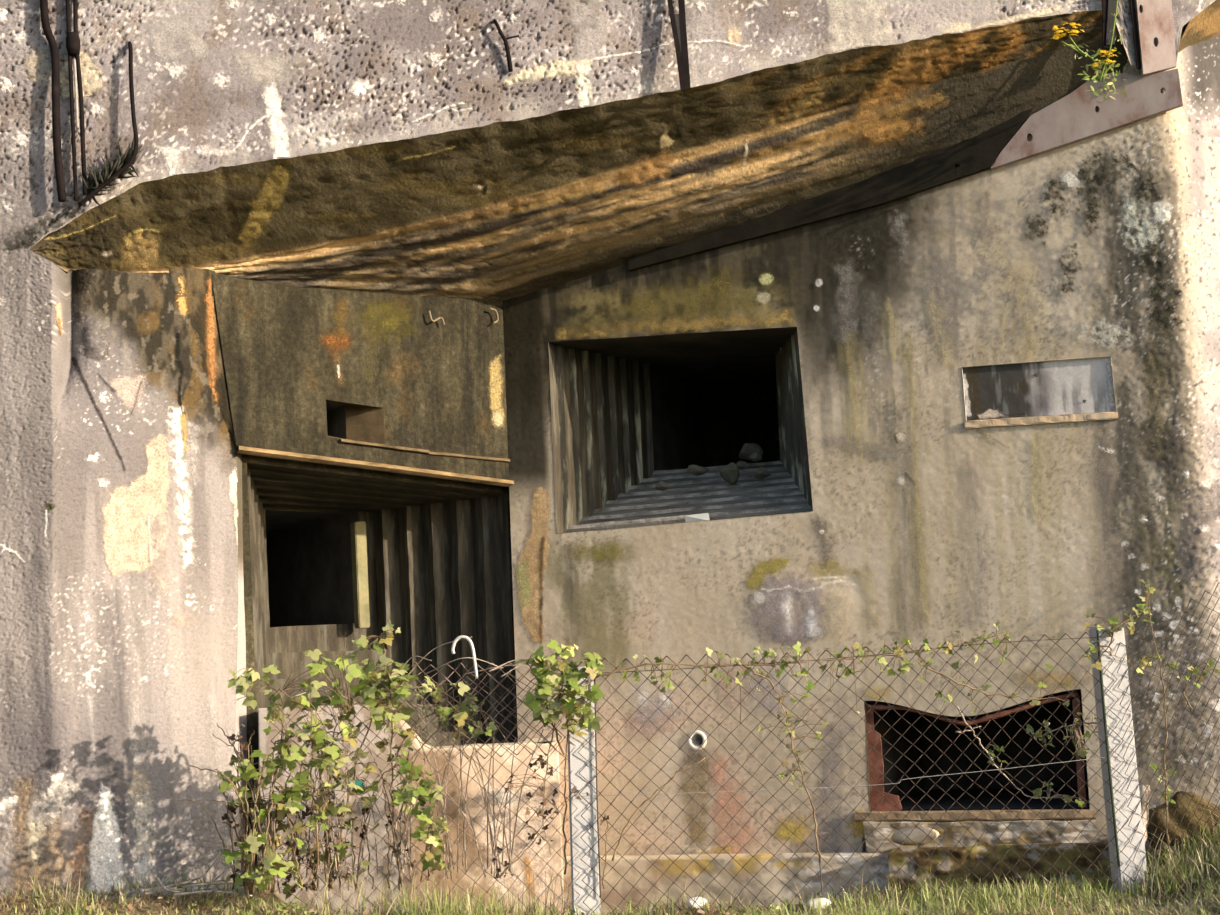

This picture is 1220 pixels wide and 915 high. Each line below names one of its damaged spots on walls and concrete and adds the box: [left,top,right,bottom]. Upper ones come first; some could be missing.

flaking render [102,434,170,593]
damp [1098,420,1152,658]
damp [0,642,81,859]